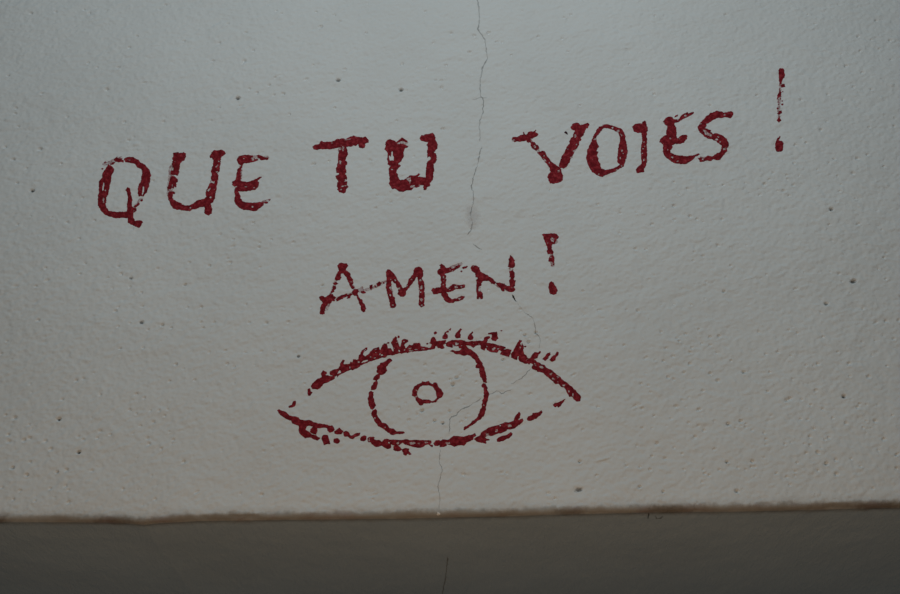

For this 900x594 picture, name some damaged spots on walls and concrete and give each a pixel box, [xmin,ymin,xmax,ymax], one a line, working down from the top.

crack [468,1,488,250]
crack [437,370,530,502]